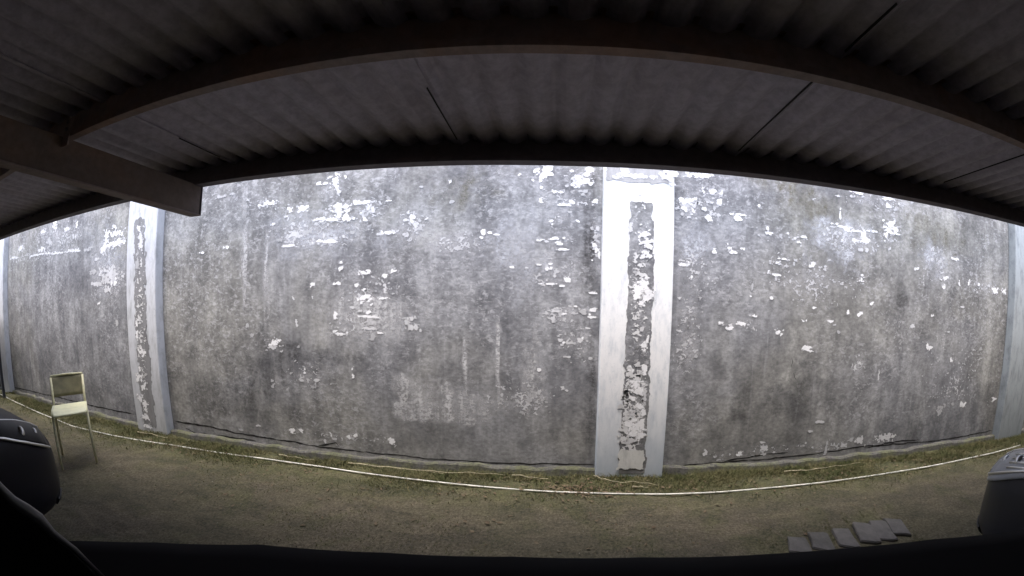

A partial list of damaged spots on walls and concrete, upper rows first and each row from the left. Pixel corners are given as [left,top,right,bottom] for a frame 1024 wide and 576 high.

peeling [215,172,500,256]
peeling [10,211,157,432]
peeling [329,261,422,341]
peeling [509,165,914,474]
peeling [914,241,1007,295]
peeling [480,380,568,415]
peeling [922,331,988,416]